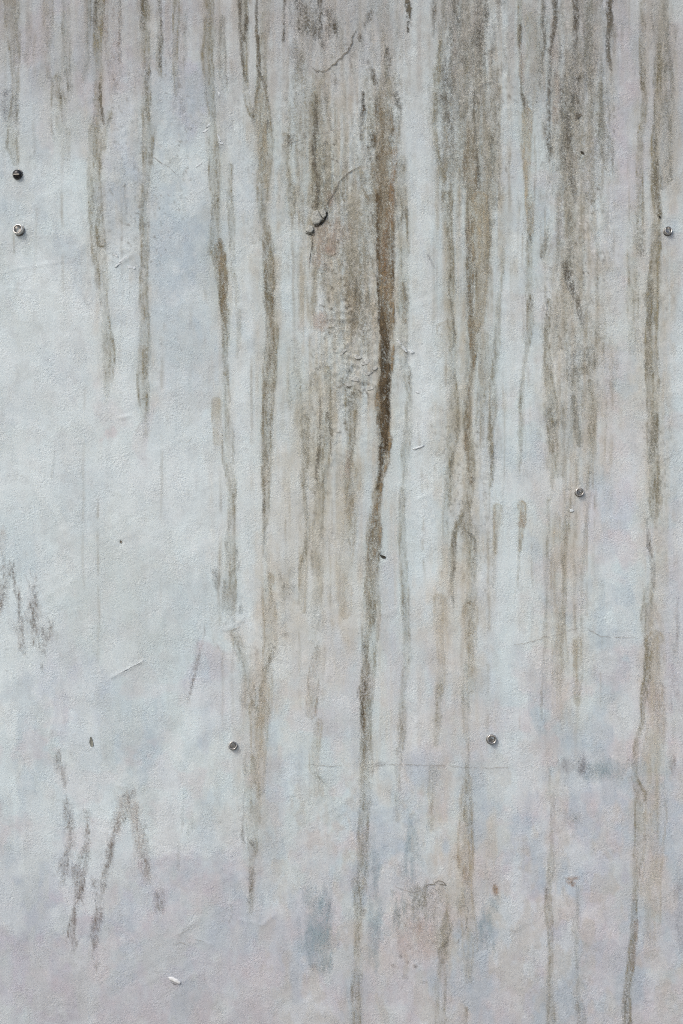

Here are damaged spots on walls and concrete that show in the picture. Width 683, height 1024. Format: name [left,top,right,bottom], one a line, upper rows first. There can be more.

damp [238,1,267,91]
crack [314,31,356,72]
damp [636,127,662,221]
spalling [306,209,328,263]
damp [211,242,228,339]
damp [627,235,661,502]